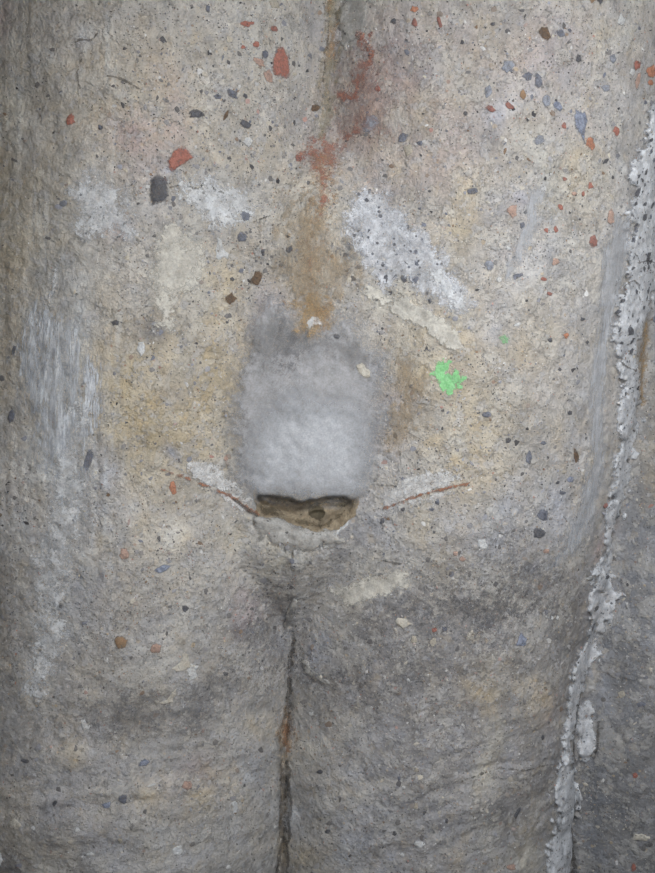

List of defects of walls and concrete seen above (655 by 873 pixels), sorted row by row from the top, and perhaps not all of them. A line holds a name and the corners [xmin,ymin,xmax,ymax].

crack [322,1,330,82]
corrosion [337,32,375,102]
corrosion [288,117,366,337]
leakage [638,322,649,405]
crack [161,454,260,517]
hole [253,487,359,537]
crack [381,469,470,516]
crack [276,636,296,873]